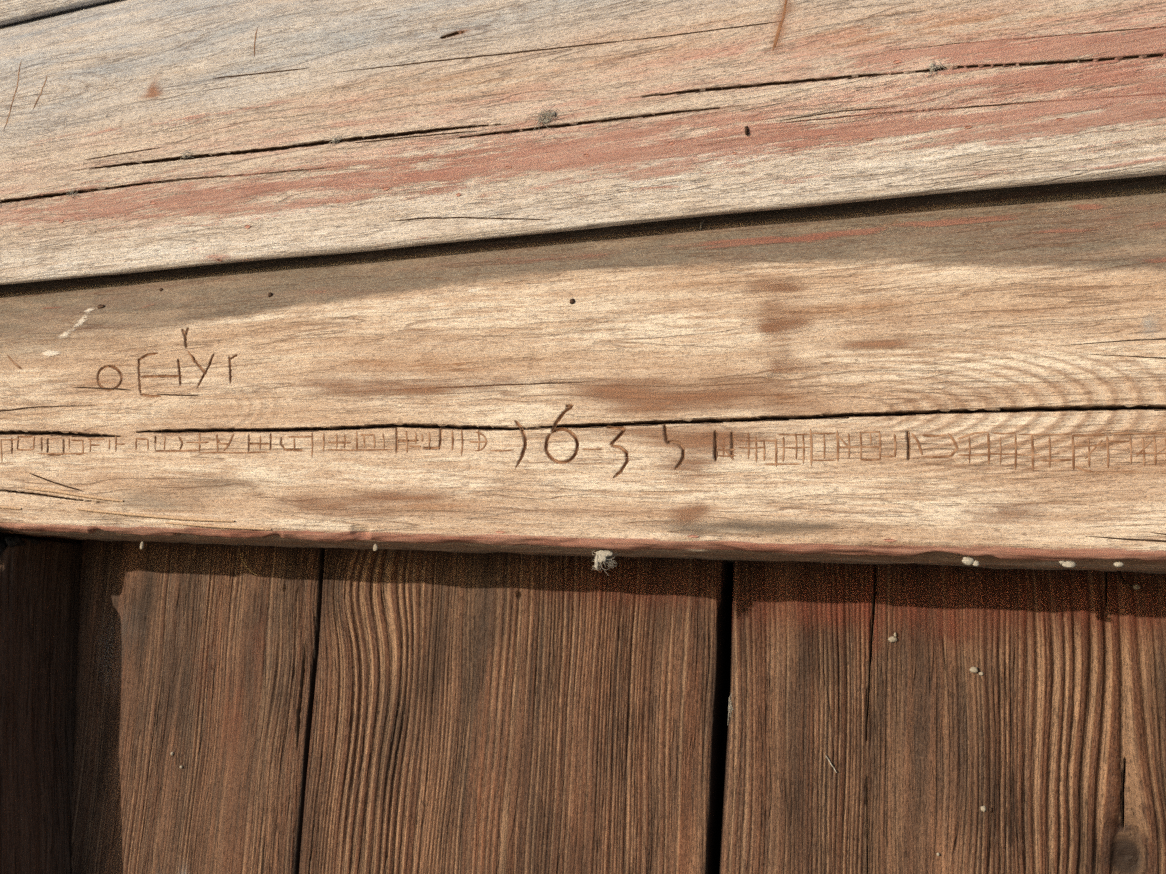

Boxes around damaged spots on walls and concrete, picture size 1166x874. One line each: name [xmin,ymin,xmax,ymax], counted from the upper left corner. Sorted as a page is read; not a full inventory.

crack [0,21,1166,203]
crack [448,381,581,389]
crack [0,387,1166,438]